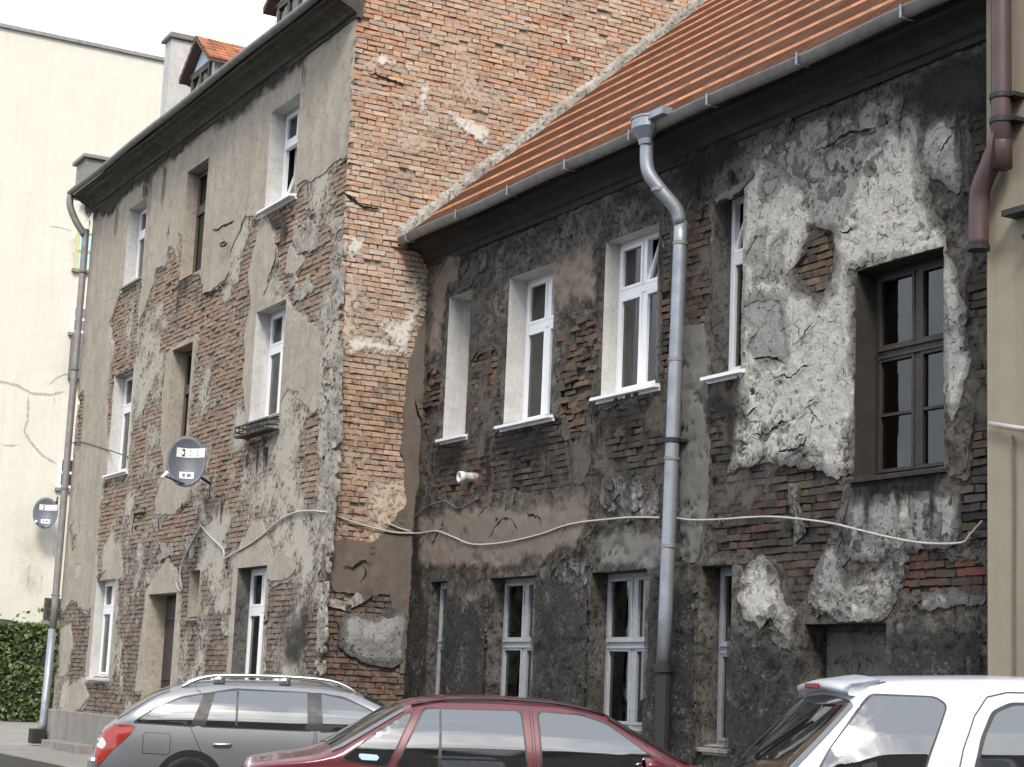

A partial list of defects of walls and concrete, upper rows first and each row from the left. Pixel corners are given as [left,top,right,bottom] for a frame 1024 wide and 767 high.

crack [818,127,883,159]
crack [343,192,380,210]
crack [0,373,68,463]
spalling [52,37,671,716]
crack [743,322,816,454]
peeling [684,84,988,710]
crack [478,506,541,536]
crack [343,560,371,581]